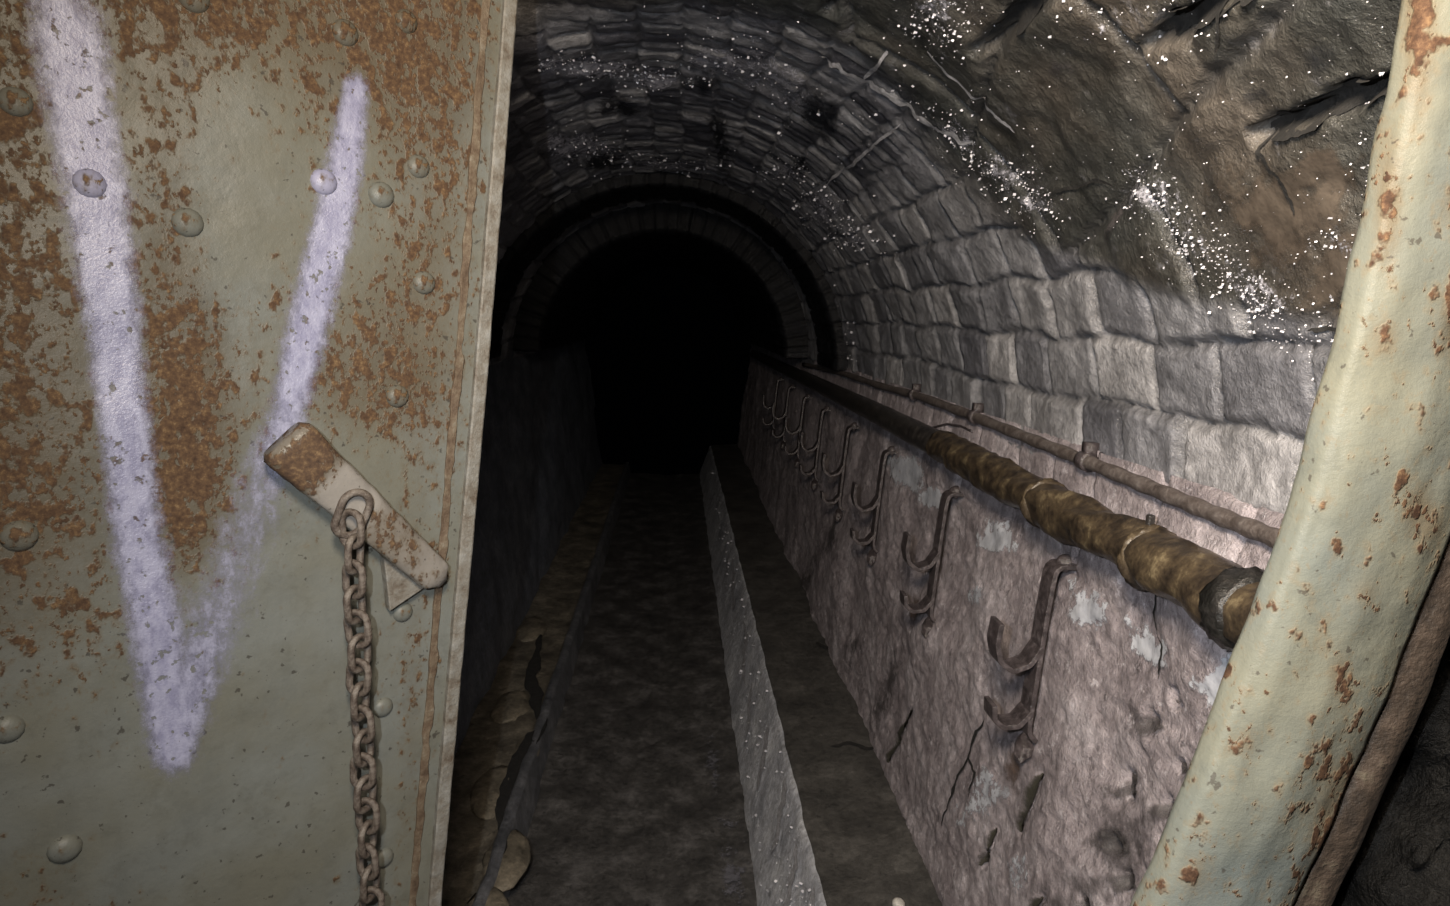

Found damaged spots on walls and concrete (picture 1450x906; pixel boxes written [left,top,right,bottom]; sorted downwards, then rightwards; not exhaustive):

damp [883,0,995,67]
damp [891,85,1071,238]
damp [1108,149,1334,381]
crack [832,741,874,750]
crack [941,715,984,826]